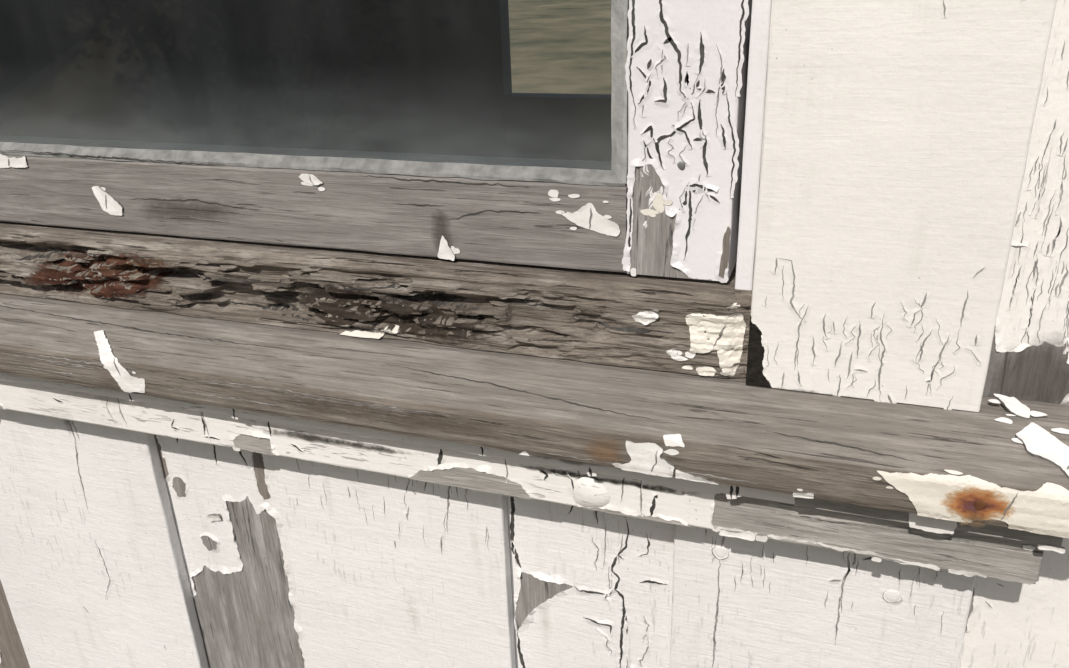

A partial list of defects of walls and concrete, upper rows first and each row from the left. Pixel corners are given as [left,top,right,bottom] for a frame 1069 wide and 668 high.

crack [939,0,950,19]
peeling [548,158,731,283]
crack [761,40,1069,410]
crack [0,305,320,354]
peeling [666,303,747,376]
peeling [612,317,1069,633]
crack [769,431,913,461]
corrosion [944,488,1011,520]
peeling [0,580,30,668]
peeling [190,430,310,668]
peeling [512,566,575,632]
crack [674,472,976,668]